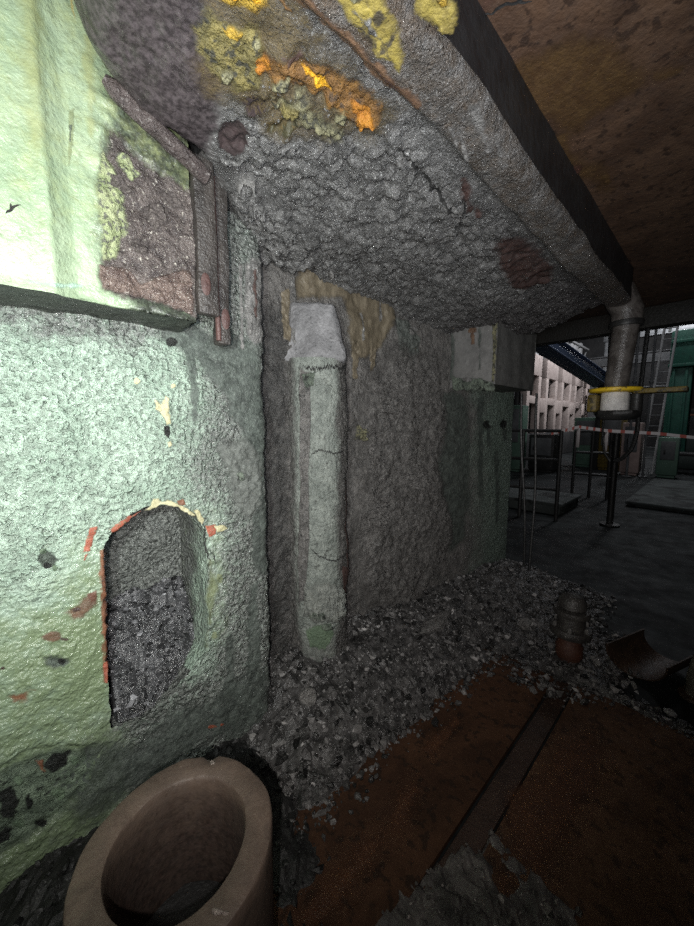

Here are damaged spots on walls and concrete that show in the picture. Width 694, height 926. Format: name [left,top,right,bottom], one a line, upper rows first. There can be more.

peeling [338,0,402,70]
spalling [218,96,298,168]
spalling [97,131,196,317]
peeling [154,384,176,447]
peeling [111,513,137,532]
peeling [147,499,228,537]
spalling [0,749,93,852]